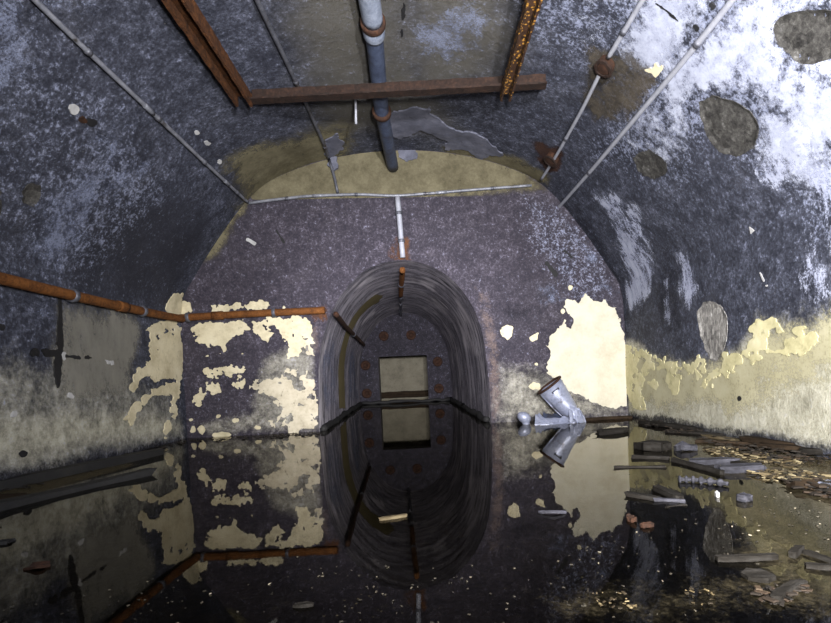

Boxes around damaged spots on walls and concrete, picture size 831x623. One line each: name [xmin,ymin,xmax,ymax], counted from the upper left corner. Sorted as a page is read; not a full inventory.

spalling [770,9,831,66]
water stain [570,0,831,251]
spalling [699,95,759,157]
water stain [594,191,654,310]
water stain [676,252,699,309]
water stain [799,246,831,303]
peeling [123,293,318,439]
peeling [500,325,513,340]
peeling [535,285,819,411]